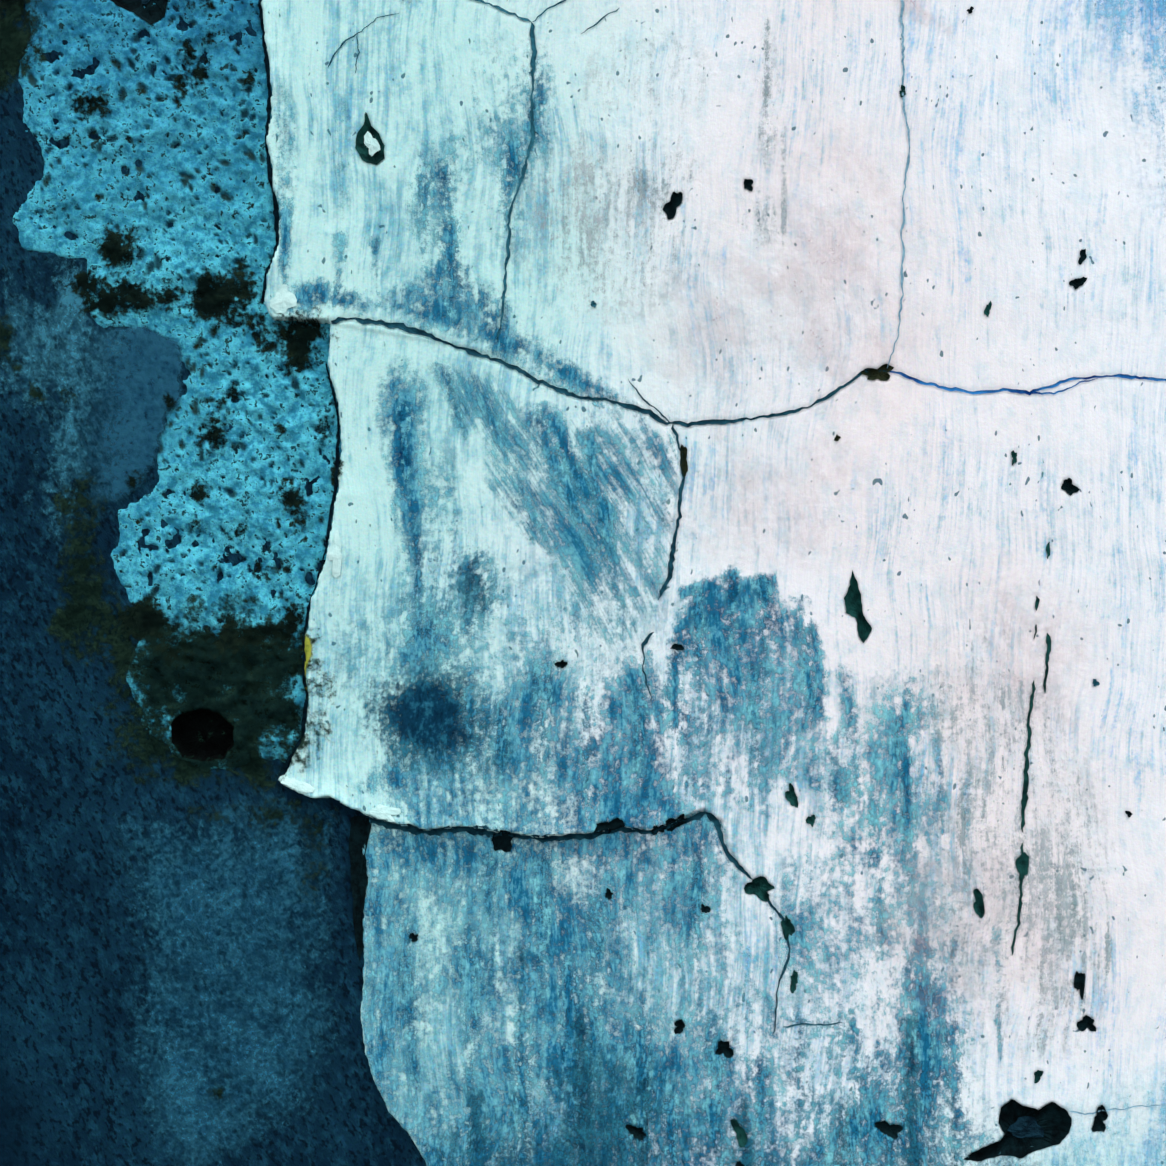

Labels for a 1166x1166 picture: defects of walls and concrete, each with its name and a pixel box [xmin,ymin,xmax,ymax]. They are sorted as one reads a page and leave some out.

flaking render [126,639,185,754]
leakage [0,225,339,1164]
flaking render [13,0,342,658]
crack [258,0,280,304]
flaking render [258,675,315,793]
crack [281,363,340,776]
leakage [318,415,343,486]
peeling [364,131,381,156]
peeling [369,804,401,823]
crack [362,812,842,1035]
crack [328,0,1166,600]
crack [1011,596,1051,955]